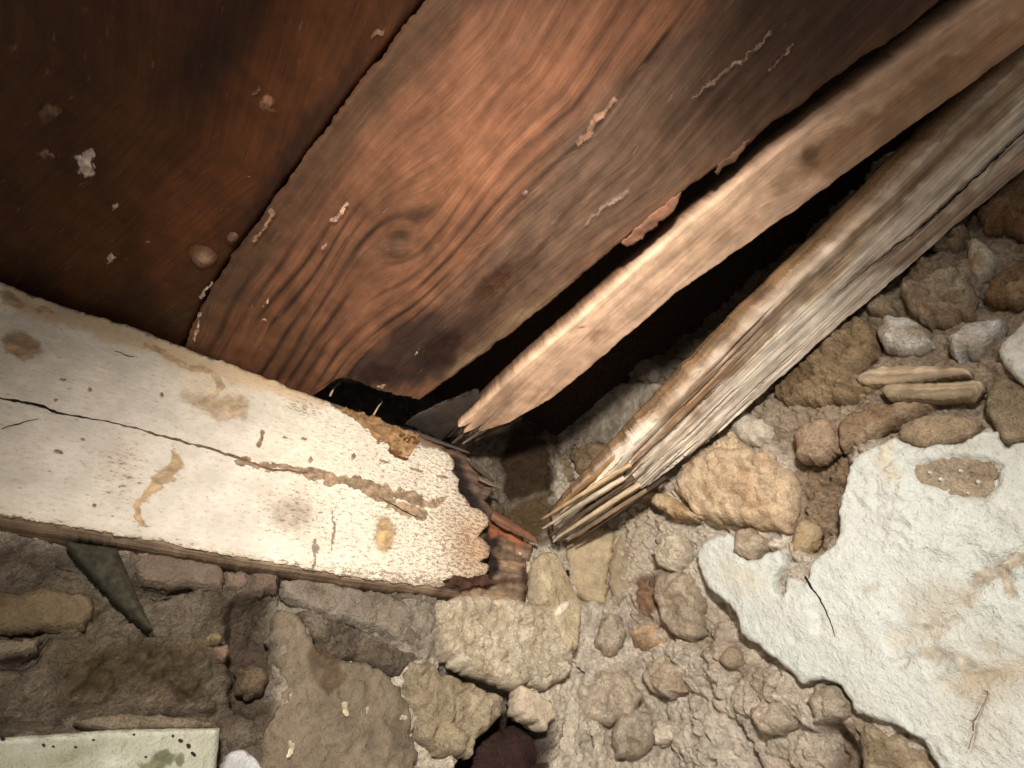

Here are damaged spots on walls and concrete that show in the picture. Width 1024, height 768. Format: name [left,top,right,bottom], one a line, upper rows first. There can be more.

crack [0,397,446,521]
crack [804,576,835,635]